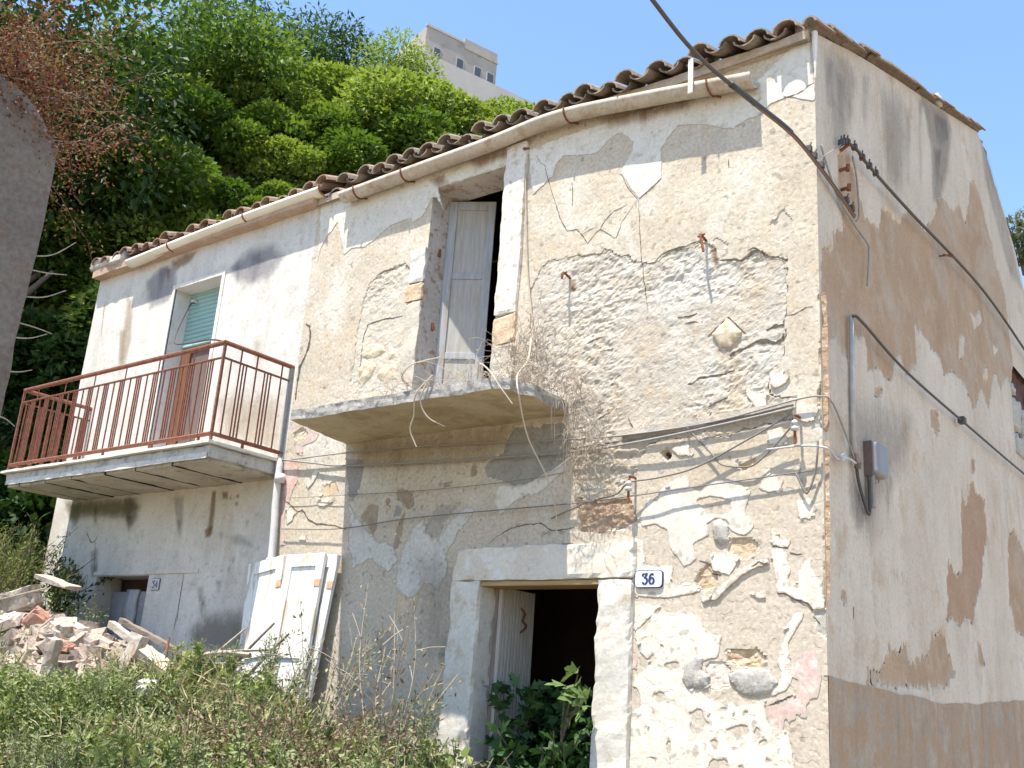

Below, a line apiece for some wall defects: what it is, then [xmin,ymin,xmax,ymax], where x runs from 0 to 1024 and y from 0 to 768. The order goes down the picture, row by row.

damp [149,269,173,302]
damp [236,251,276,279]
spalling [350,264,410,396]
peeling [317,144,514,262]
crack [537,157,700,309]
damp [68,500,135,522]
corrosion [208,493,227,534]
peeling [279,428,475,598]
spalling [470,151,1013,768]
damp [196,621,240,645]
spalling [1008,528,1024,636]